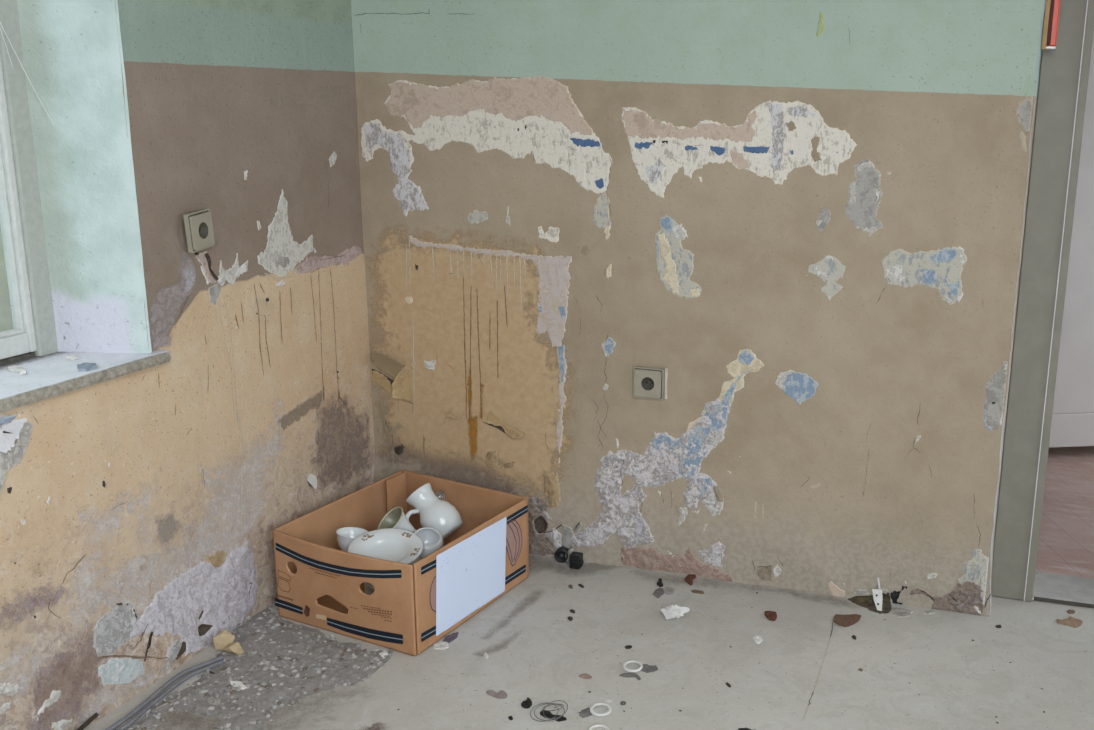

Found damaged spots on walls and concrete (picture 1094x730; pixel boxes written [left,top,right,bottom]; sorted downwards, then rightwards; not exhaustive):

peeling [361,75,612,240]
peeling [621,100,891,236]
peeling [209,189,316,422]
peeling [878,246,967,305]
peeling [369,210,765,556]
peeling [775,370,818,405]
peeling [0,414,33,495]
damp [0,269,370,656]
damp [0,635,115,730]
spalling [93,603,186,686]
spalling [198,611,212,636]
spalling [848,546,990,618]